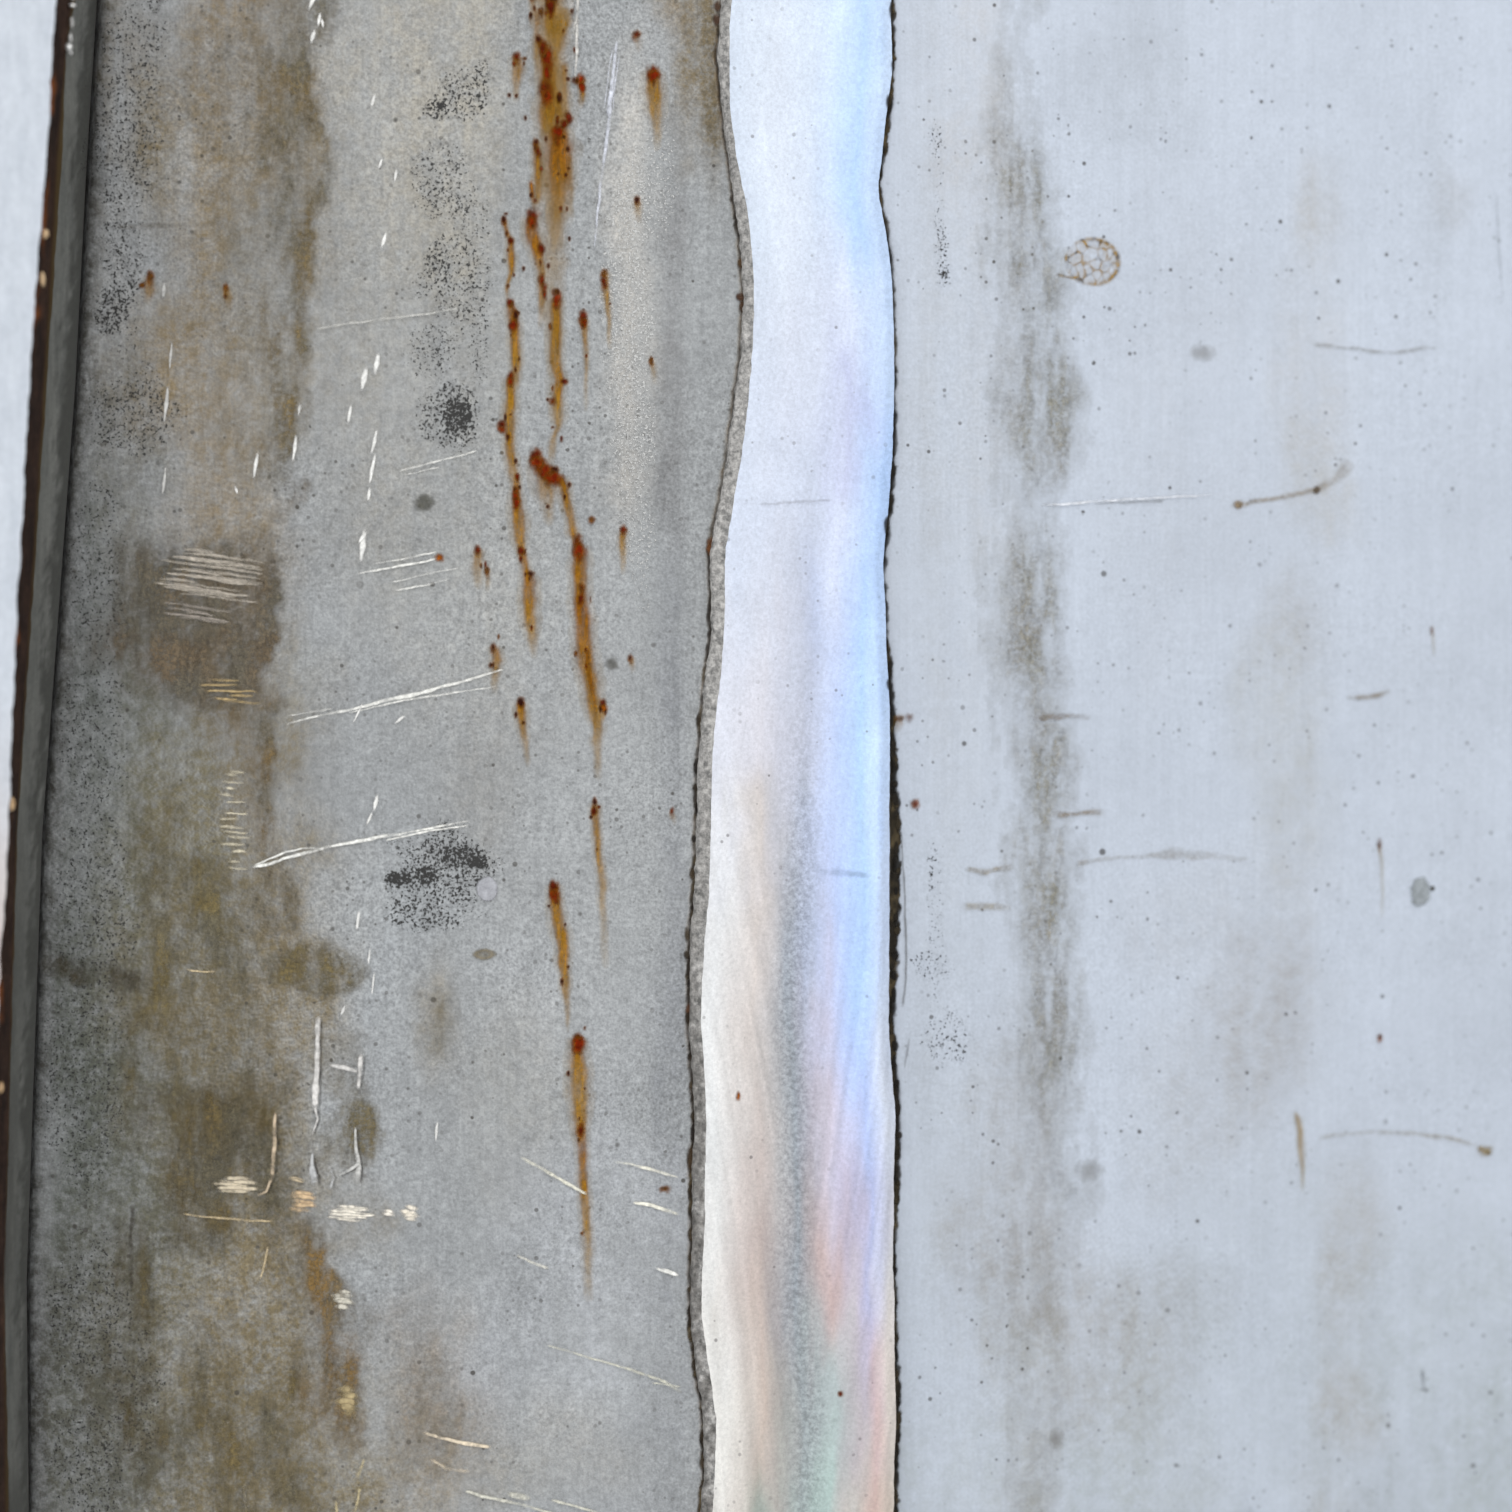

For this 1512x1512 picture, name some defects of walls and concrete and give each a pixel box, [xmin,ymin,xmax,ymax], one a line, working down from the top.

rust [601,269,611,312]
damp [1047,239,1120,297]
rust [498,0,607,737]
damp [1019,360,1071,451]
rust [475,545,489,575]
rust [489,634,500,671]
damp [1011,564,1052,681]
rust [589,797,600,868]
rust [548,880,570,998]
damp [1033,875,1063,938]
rust [567,1027,589,1237]